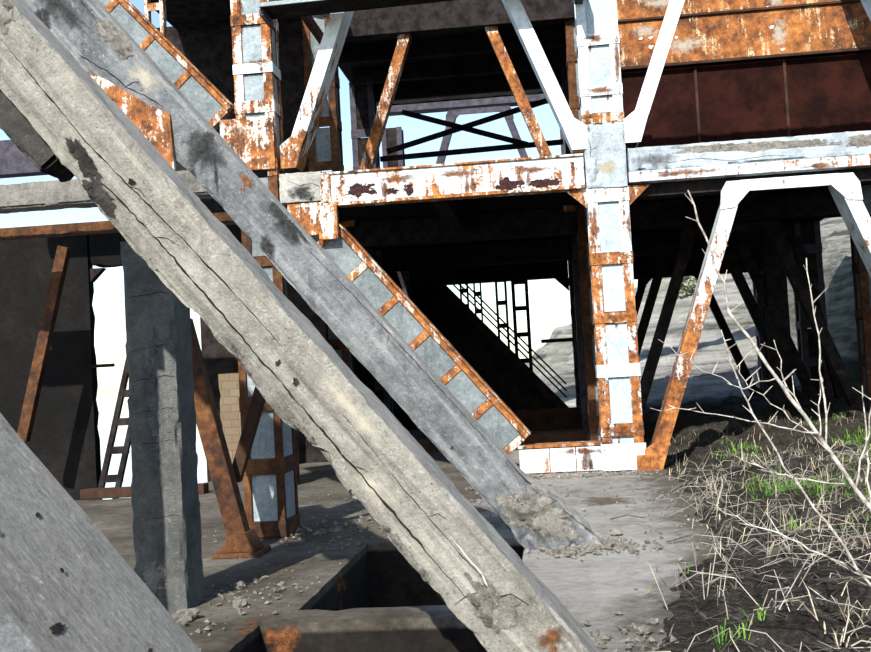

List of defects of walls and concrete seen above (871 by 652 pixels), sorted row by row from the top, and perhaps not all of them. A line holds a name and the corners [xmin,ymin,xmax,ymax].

rust [232,128,269,164]
rust [381,175,411,197]
rust [444,169,476,193]
rust [511,166,544,189]
rust [590,208,598,258]
crack [2,41,529,614]
spalling [494,484,585,544]
rust [266,627,297,652]